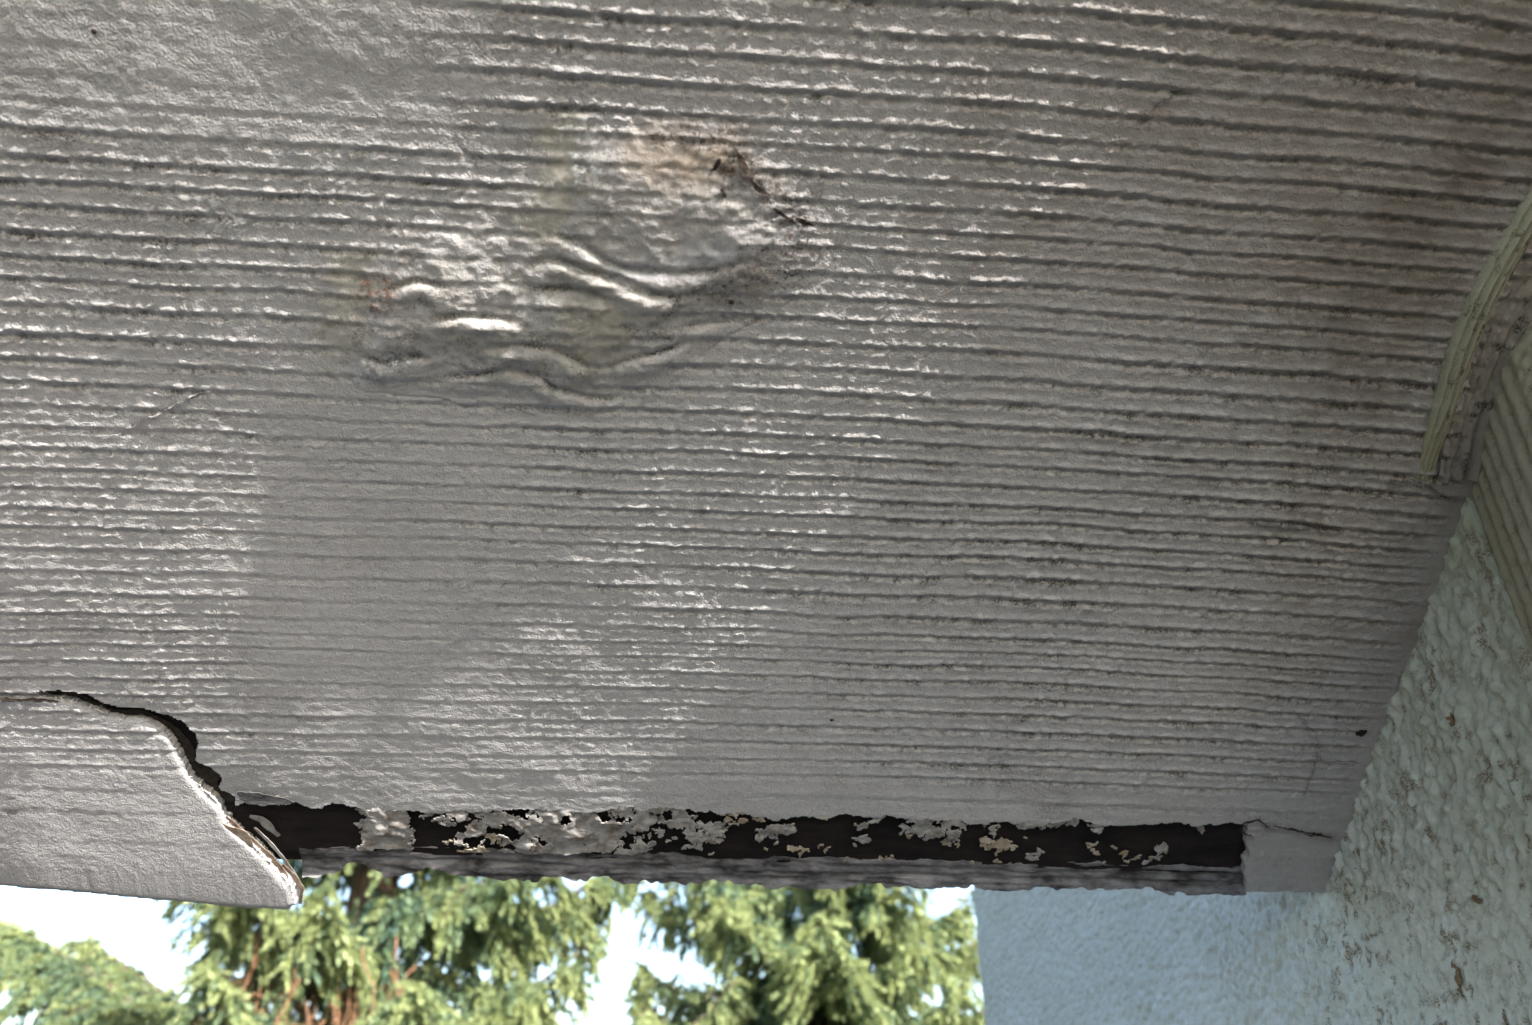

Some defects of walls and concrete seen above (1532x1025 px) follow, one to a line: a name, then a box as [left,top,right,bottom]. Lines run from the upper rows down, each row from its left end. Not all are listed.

crack [0,691,236,803]
spalling [0,691,1243,909]